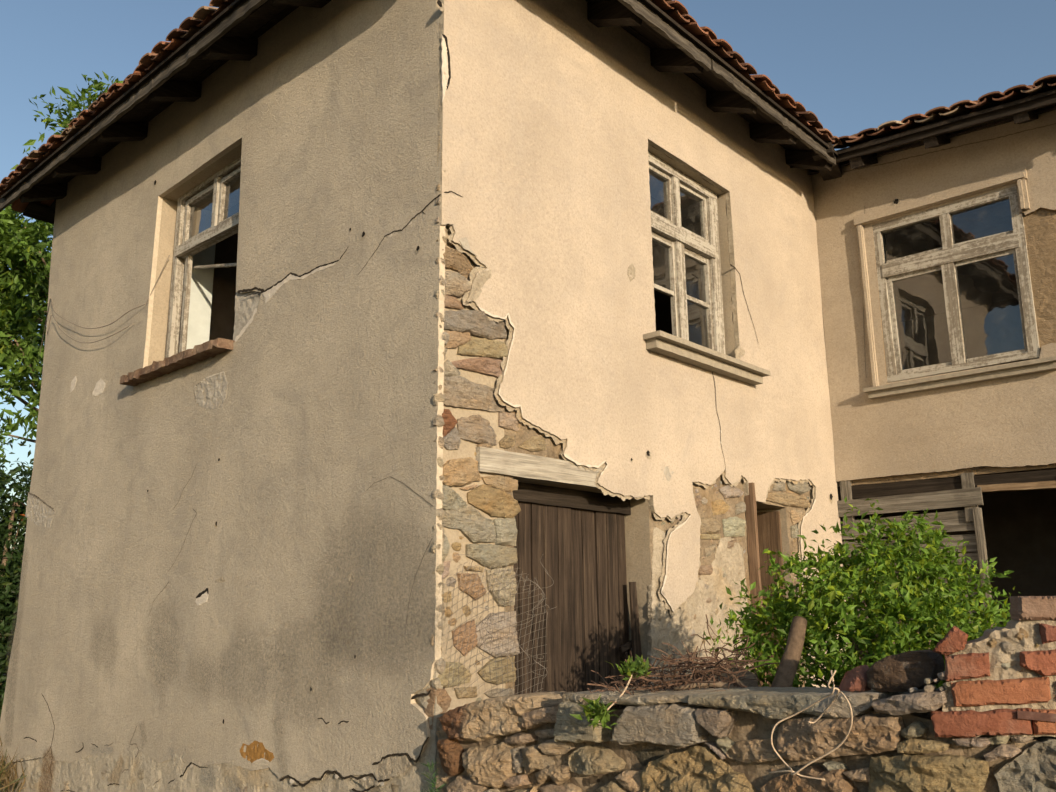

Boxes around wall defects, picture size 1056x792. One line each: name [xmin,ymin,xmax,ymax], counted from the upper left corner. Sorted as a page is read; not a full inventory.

crack [237,191,462,303]
spalling [425,184,650,729]
crack [712,372,726,471]
spalling [766,478,816,562]
flaking render [647,472,751,687]
crack [12,695,139,792]
crack [153,762,208,786]
spalling [240,741,274,763]
crack [279,737,429,792]